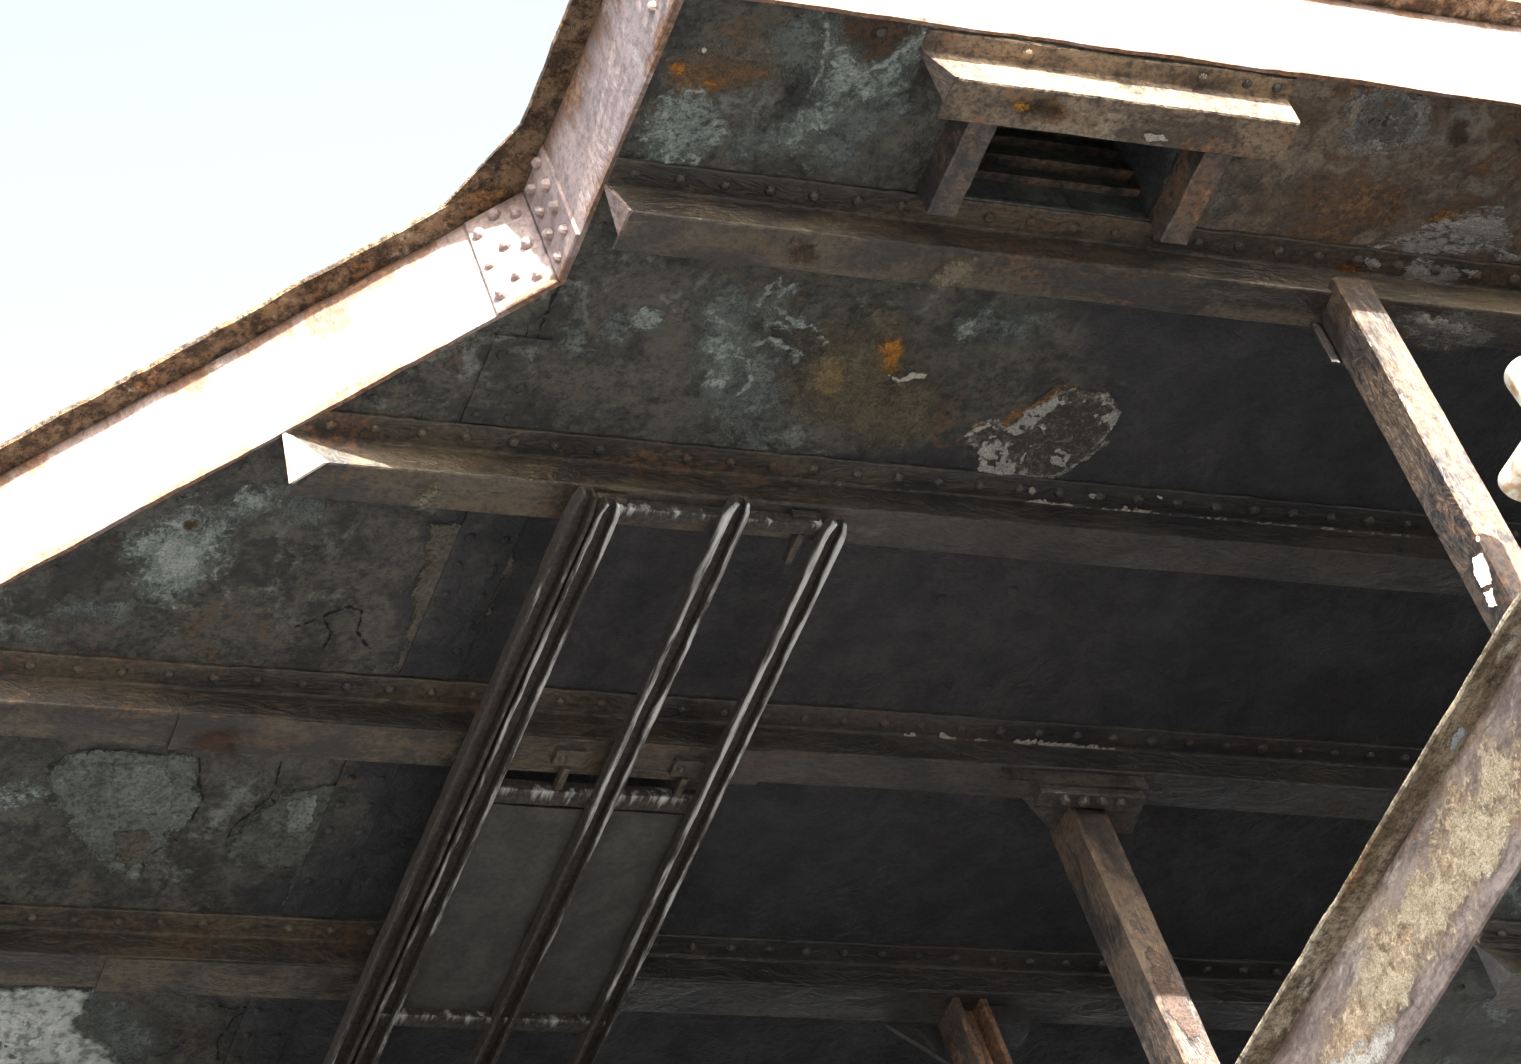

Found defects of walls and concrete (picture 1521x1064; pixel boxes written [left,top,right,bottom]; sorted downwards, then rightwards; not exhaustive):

rust [667,48,773,99]
damp [641,9,942,172]
rust [777,307,943,449]
peeling [964,386,1121,495]
crack [295,605,370,649]
crack [140,758,204,875]
crack [227,762,282,838]
rust [1320,721,1521,1064]
damp [82,993,165,1064]